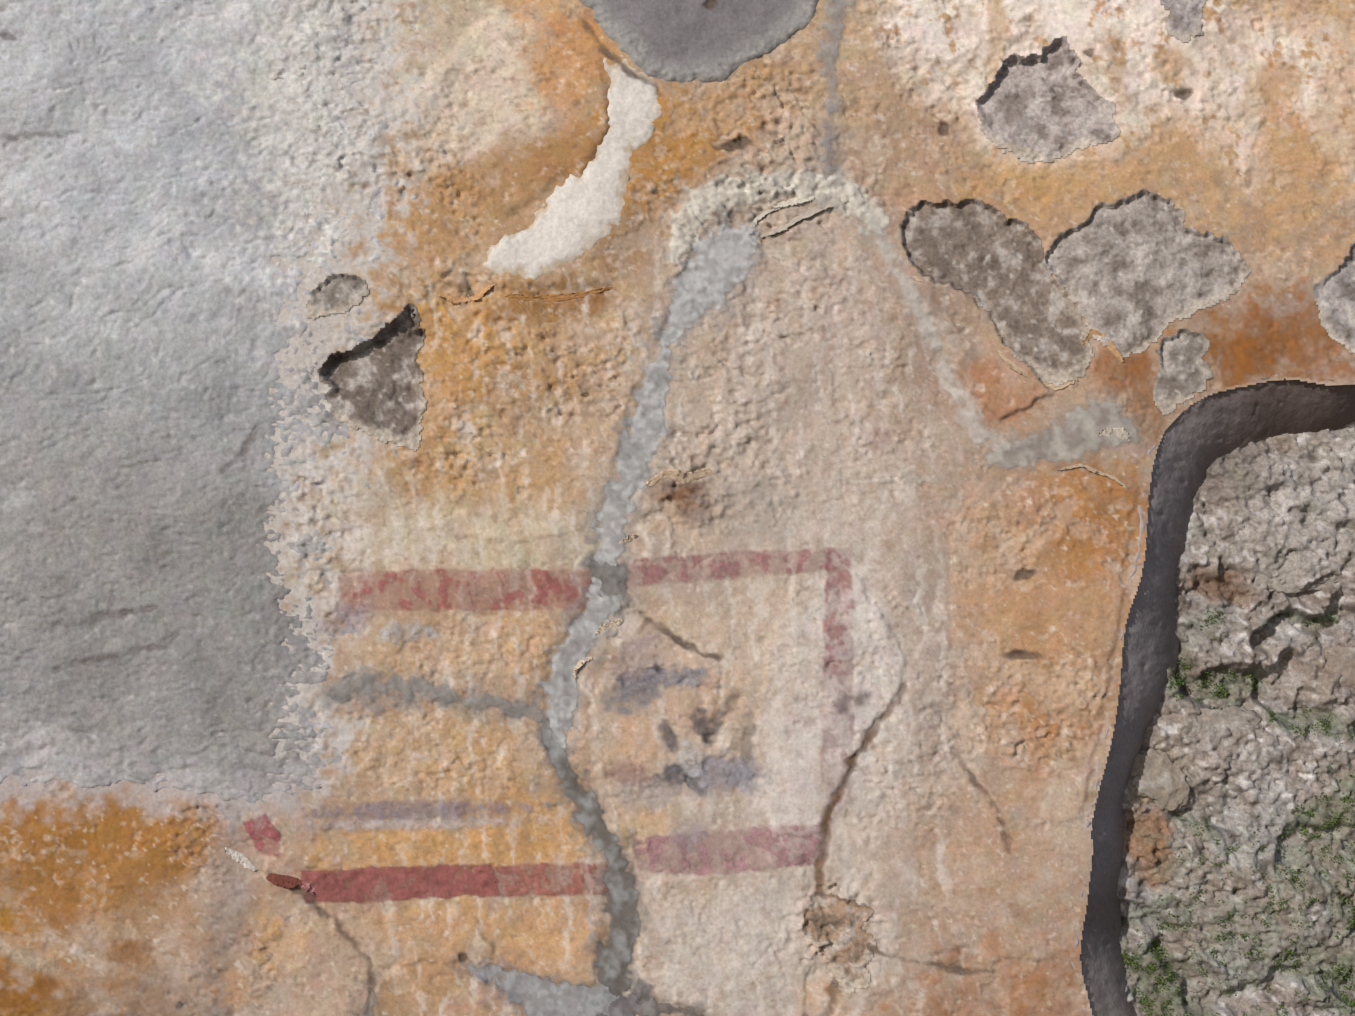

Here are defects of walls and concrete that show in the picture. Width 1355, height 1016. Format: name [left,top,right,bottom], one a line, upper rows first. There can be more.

spalling [975,36,1120,163]
spalling [317,303,427,451]
crack [325,0,1139,1016]
spalling [899,188,1355,1016]
crack [294,889,341,932]